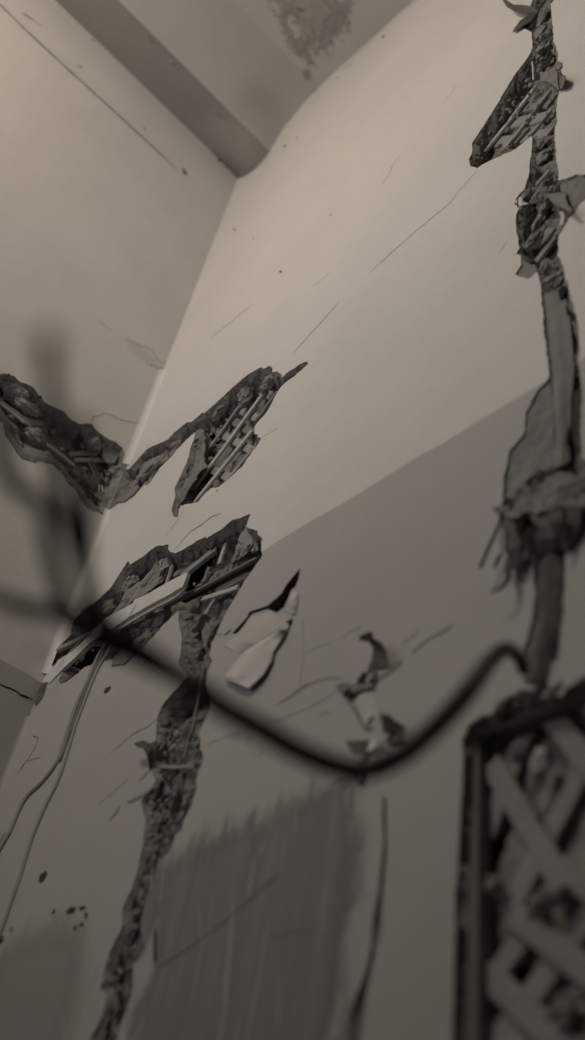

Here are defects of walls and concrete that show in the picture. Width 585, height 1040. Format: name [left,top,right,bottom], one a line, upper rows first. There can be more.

peeling [267,0,358,80]
flaking render [0,373,46,463]
spalling [89,362,308,517]
spalling [452,0,585,1040]
flaking render [34,638,126,706]
flaking render [100,514,300,689]
peeling [335,632,405,759]
flaking render [51,905,88,930]
flaking render [90,688,208,1040]
spalling [348,797,387,1040]